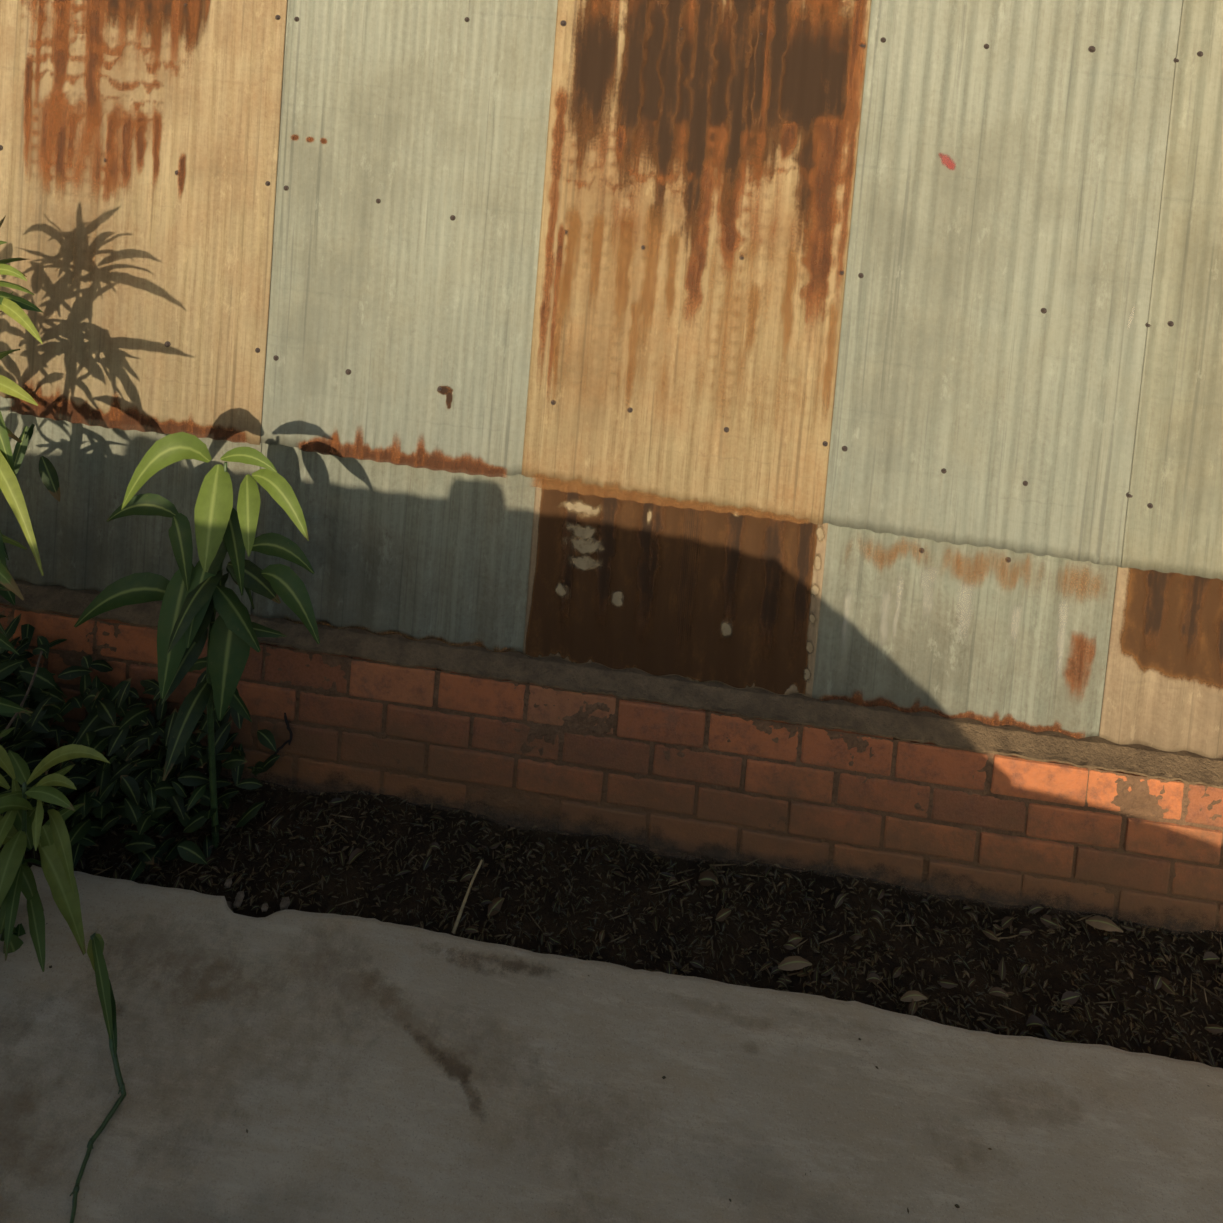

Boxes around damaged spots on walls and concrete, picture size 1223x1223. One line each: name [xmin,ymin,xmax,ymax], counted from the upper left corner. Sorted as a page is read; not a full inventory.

rust [22,0,210,198]
rust [539,0,867,410]
rust [10,383,245,443]
rust [437,386,453,409]
rust [299,432,506,478]
rust [287,474,818,694]
peeling [555,583,569,597]
peeling [563,501,605,571]
peeling [612,591,624,606]
peeling [721,622,732,636]
peeling [811,526,825,596]
rust [1120,568,1223,690]